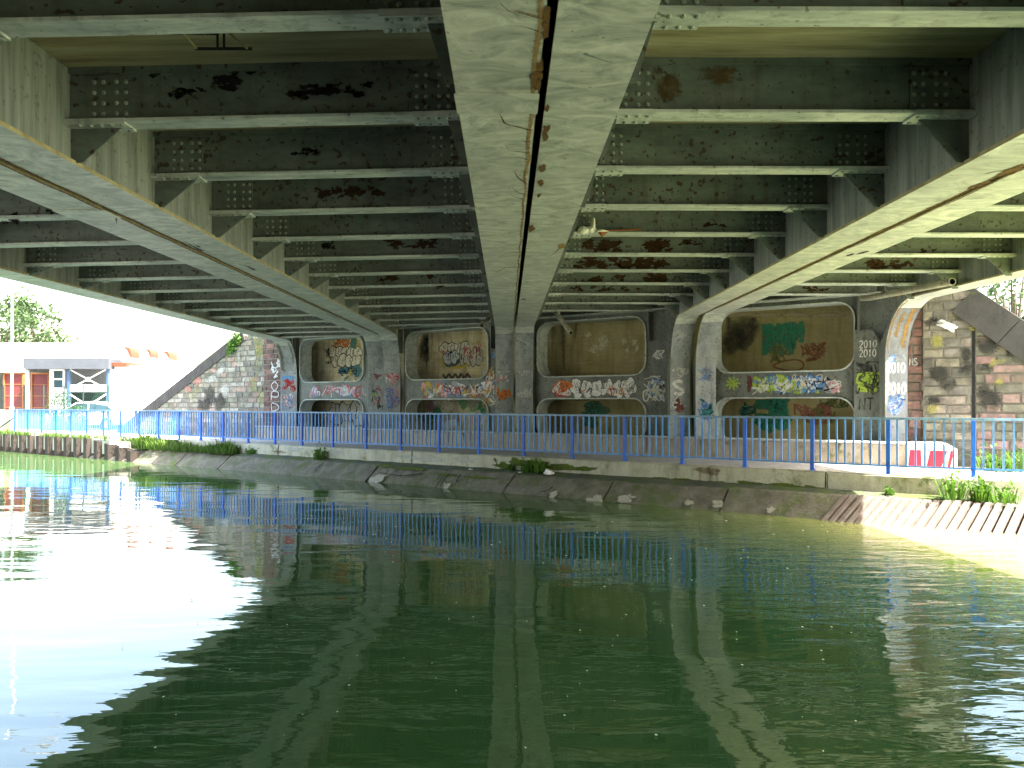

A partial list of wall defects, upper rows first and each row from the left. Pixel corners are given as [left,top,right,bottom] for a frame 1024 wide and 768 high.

corrosion [501,0,551,94]
corrosion [0,158,369,330]
corrosion [315,186,385,199]
corrosion [496,104,554,325]
corrosion [570,237,702,292]